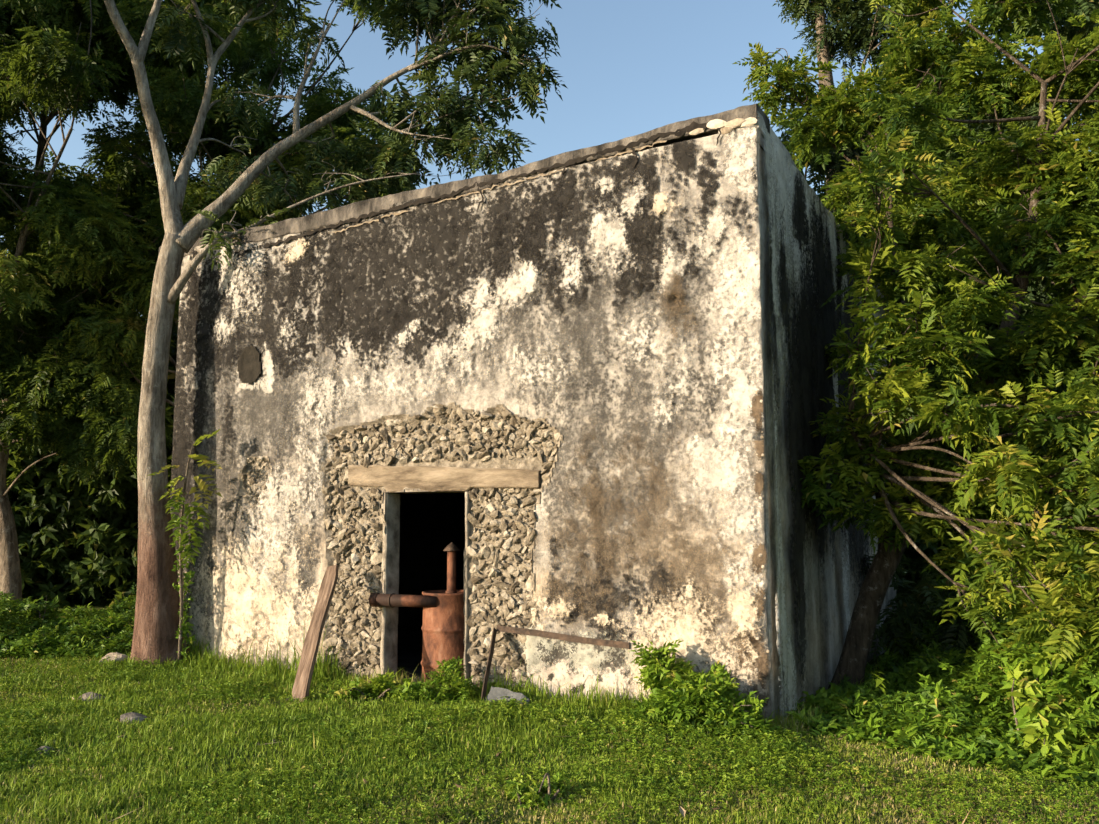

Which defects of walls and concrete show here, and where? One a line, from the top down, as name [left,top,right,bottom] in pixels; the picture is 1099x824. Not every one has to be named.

spalling [178,126,837,708]
damp [170,139,873,720]